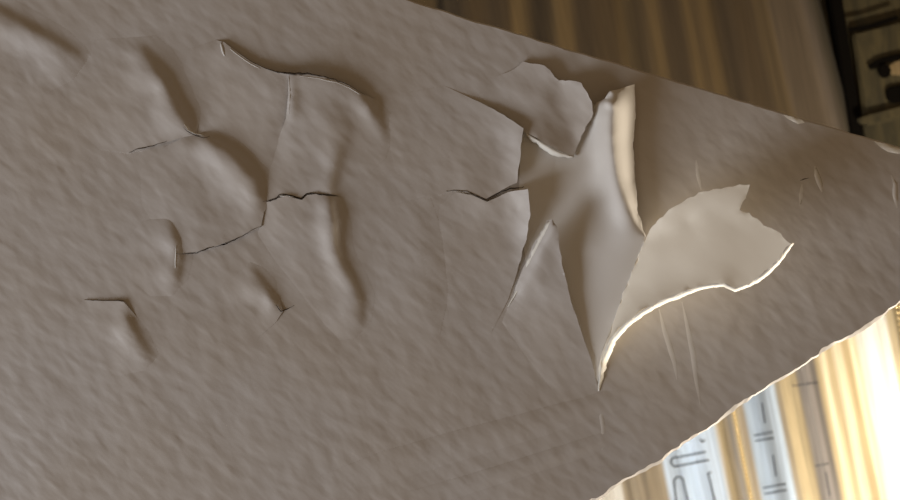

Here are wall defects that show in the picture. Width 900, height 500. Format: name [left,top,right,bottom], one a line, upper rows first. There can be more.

crack [220,42,366,109]
crack [263,193,325,202]
crack [448,186,524,200]
crack [175,227,258,268]
peeling [389,62,794,402]